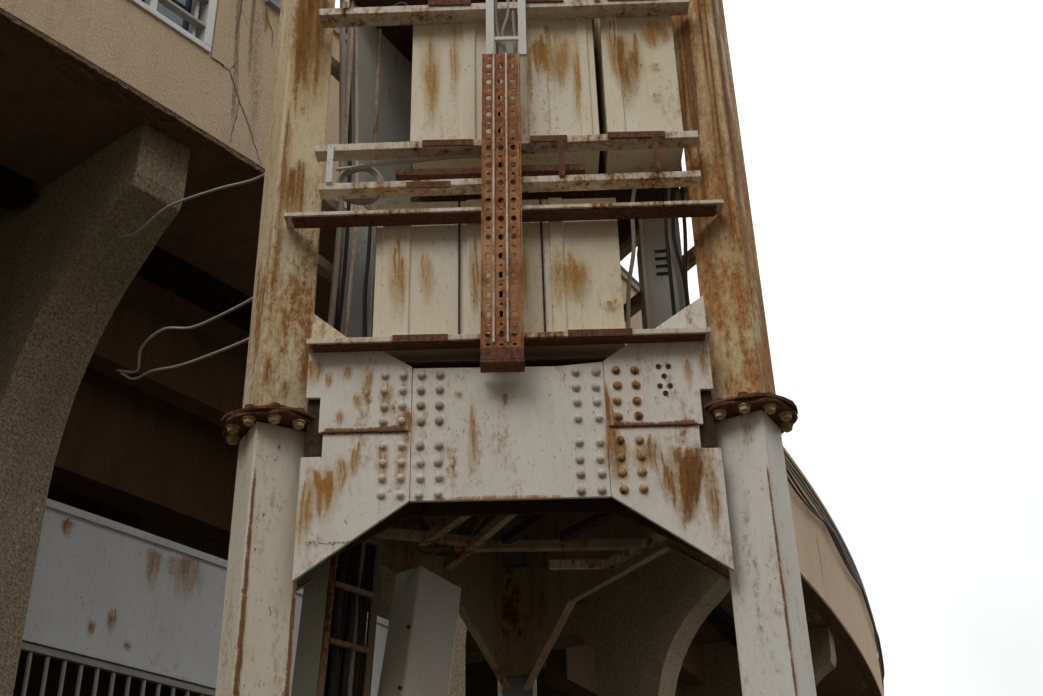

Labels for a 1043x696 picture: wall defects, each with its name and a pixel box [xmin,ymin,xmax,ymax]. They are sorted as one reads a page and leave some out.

crack [217,0,273,160]
corrosion [273,0,327,283]
corrosion [526,26,580,106]
corrosion [393,241,404,292]
corrosion [299,410,411,530]
corrosion [604,388,719,520]
corrosion [233,473,256,696]
corrosion [284,580,296,696]